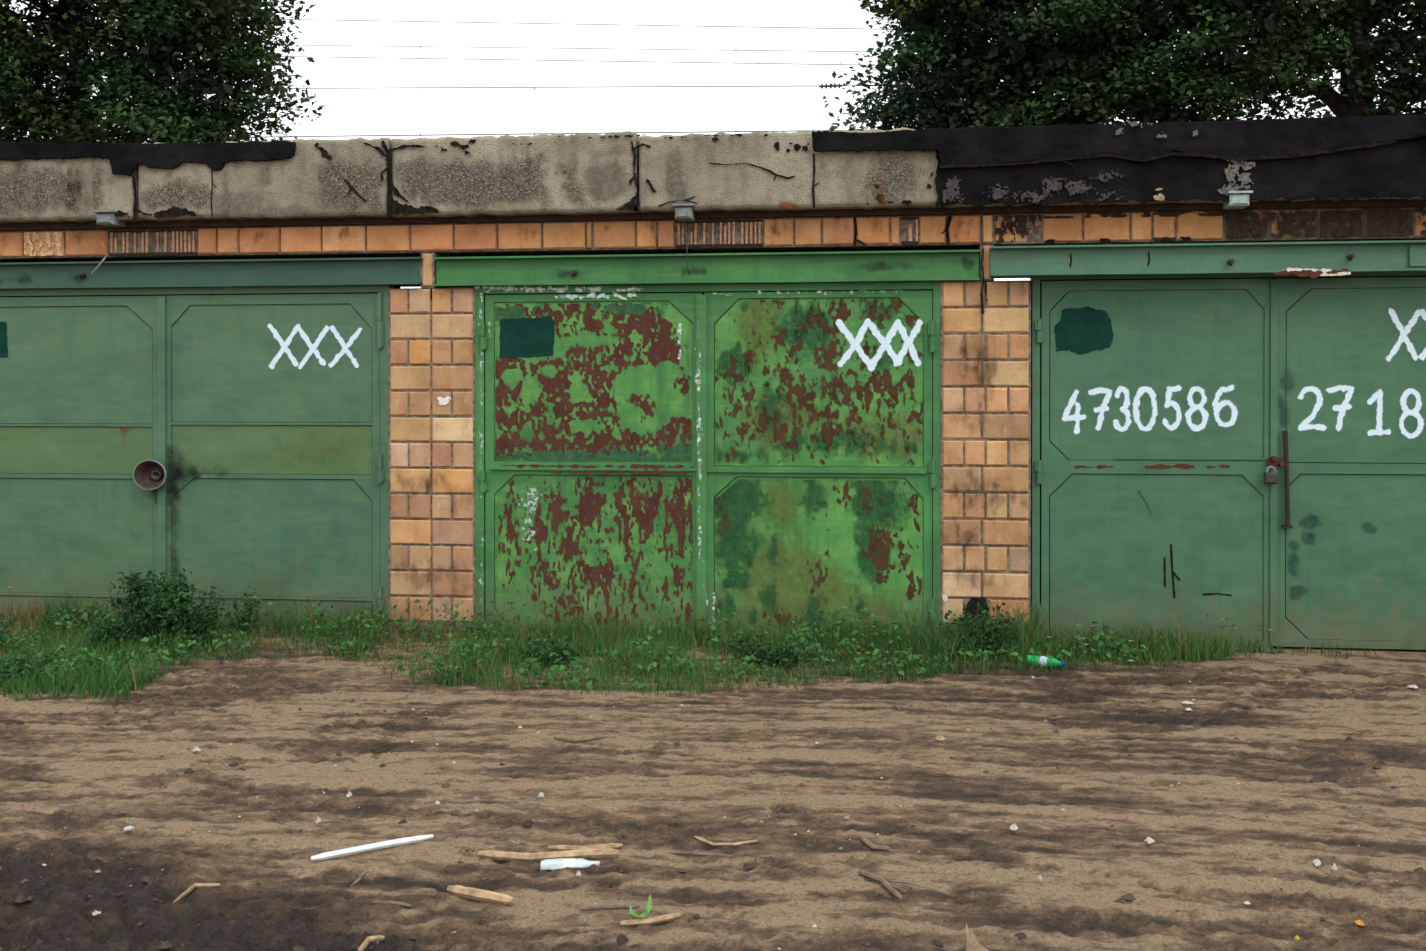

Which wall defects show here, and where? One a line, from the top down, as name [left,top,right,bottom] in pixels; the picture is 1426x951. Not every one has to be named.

crack [344,140,425,217]
crack [629,141,697,212]
crack [710,153,819,208]
crack [853,217,867,248]
spalling [867,184,918,245]
peeling [927,172,964,203]
spalling [983,170,1345,245]
rust [714,298,924,465]
rust [495,303,693,627]
rust [807,550,829,601]
rust [812,479,922,627]
leakage [1289,516,1319,599]